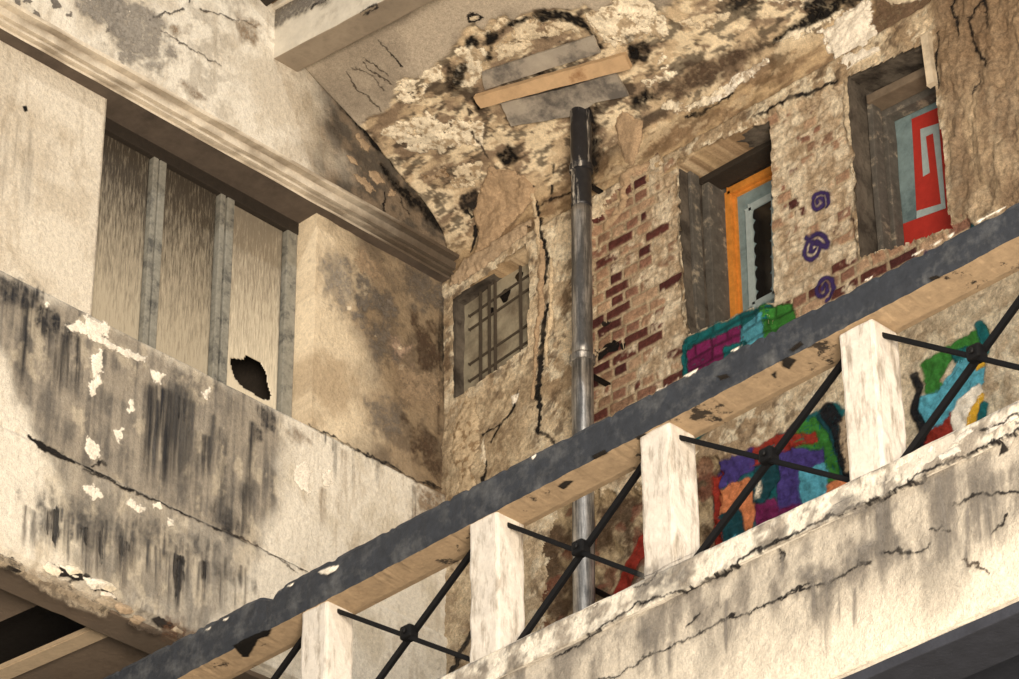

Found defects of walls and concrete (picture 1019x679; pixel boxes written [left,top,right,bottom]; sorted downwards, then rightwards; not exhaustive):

peeling [380,0,731,154]
water stain [632,0,859,106]
peeling [776,0,931,70]
crack [935,0,989,94]
water stain [460,191,477,214]
water stain [497,145,520,166]
spalling [754,82,1005,318]
water stain [1,278,80,379]
peeling [65,314,166,397]
crack [480,165,571,482]
crack [27,434,309,573]
crack [554,427,1019,679]